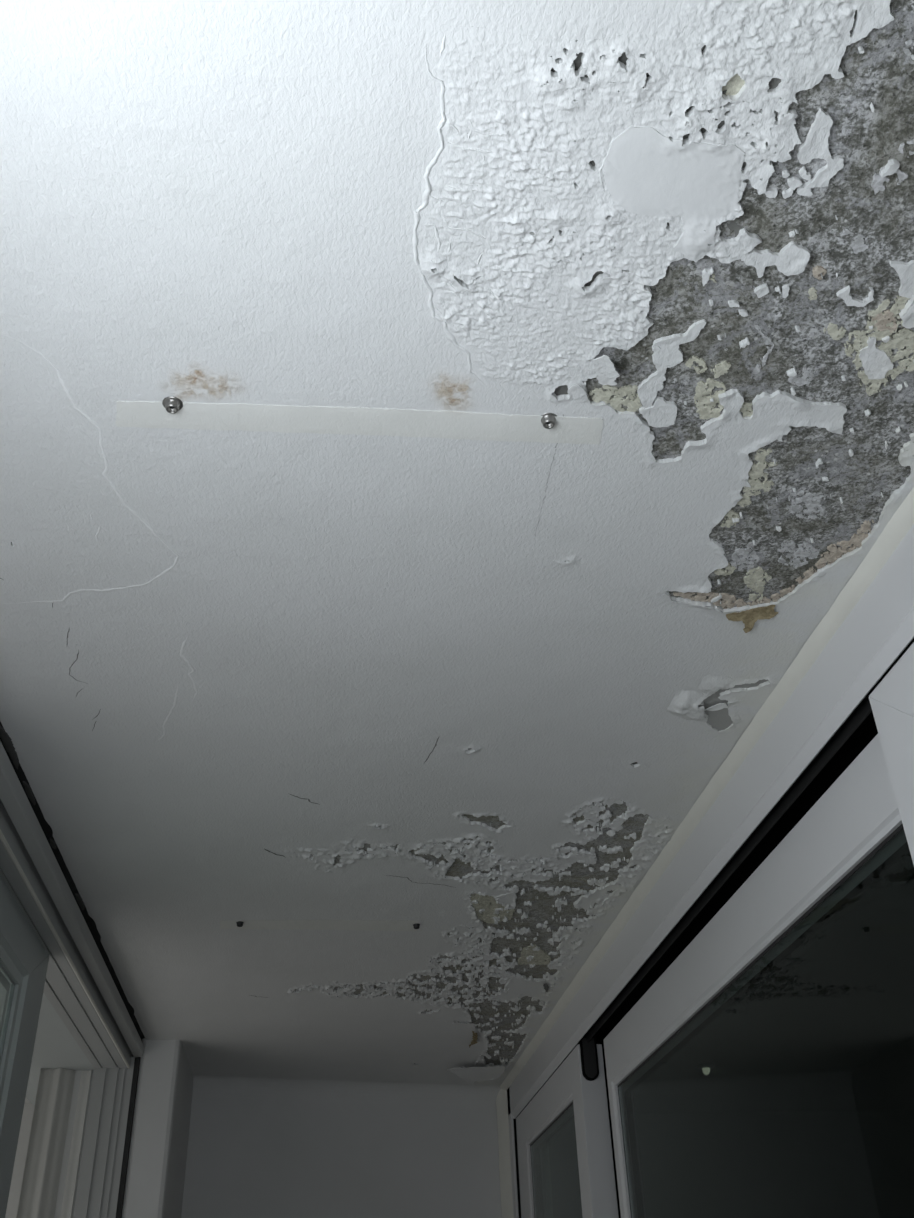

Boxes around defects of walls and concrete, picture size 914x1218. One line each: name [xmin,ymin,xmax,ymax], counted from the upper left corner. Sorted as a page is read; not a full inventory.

crack [412,34,484,384]
spalling [567,0,914,633]
peeling [703,679,769,731]
spalling [334,801,649,1086]